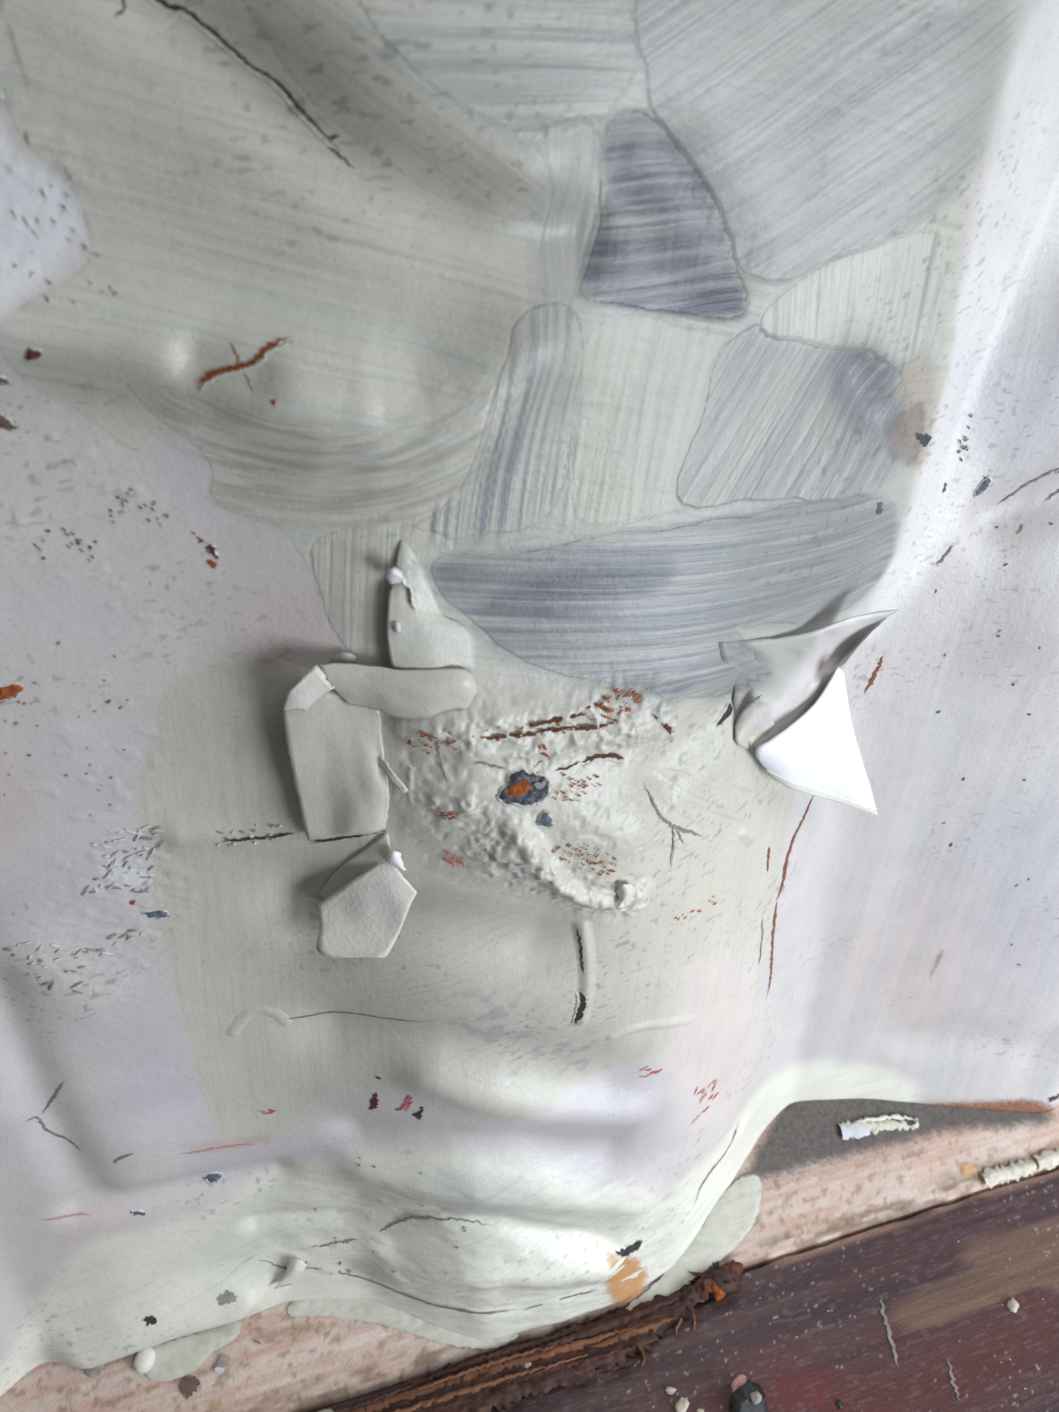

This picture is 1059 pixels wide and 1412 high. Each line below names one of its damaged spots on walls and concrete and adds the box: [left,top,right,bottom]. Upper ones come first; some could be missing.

crack [113,0,354,168]
peeling [332,652,357,664]
peeling [378,757,408,794]
crack [571,928,587,1023]